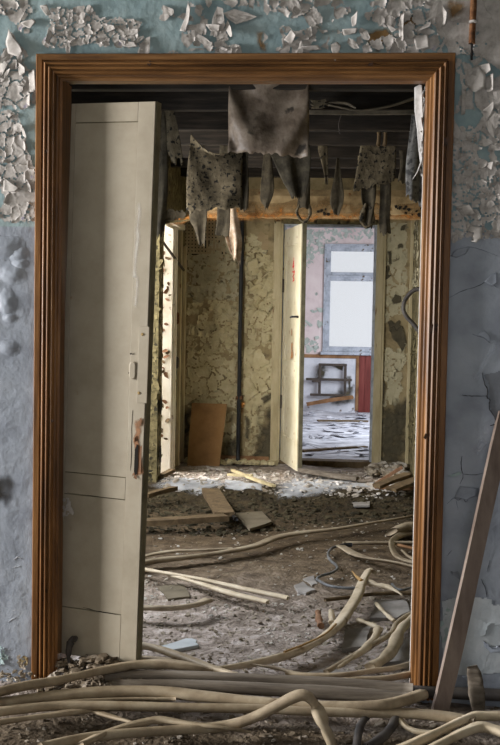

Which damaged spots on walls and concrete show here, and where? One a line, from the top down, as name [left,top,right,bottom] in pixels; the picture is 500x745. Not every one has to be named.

peeling [0,0,150,223]
peeling [159,0,500,243]
rust [236,208,360,221]
peeling [306,228,373,268]
peeling [185,233,276,456]
peeling [382,220,419,460]
crack [447,457,482,507]
spalling [439,598,456,655]
spalling [458,597,500,682]